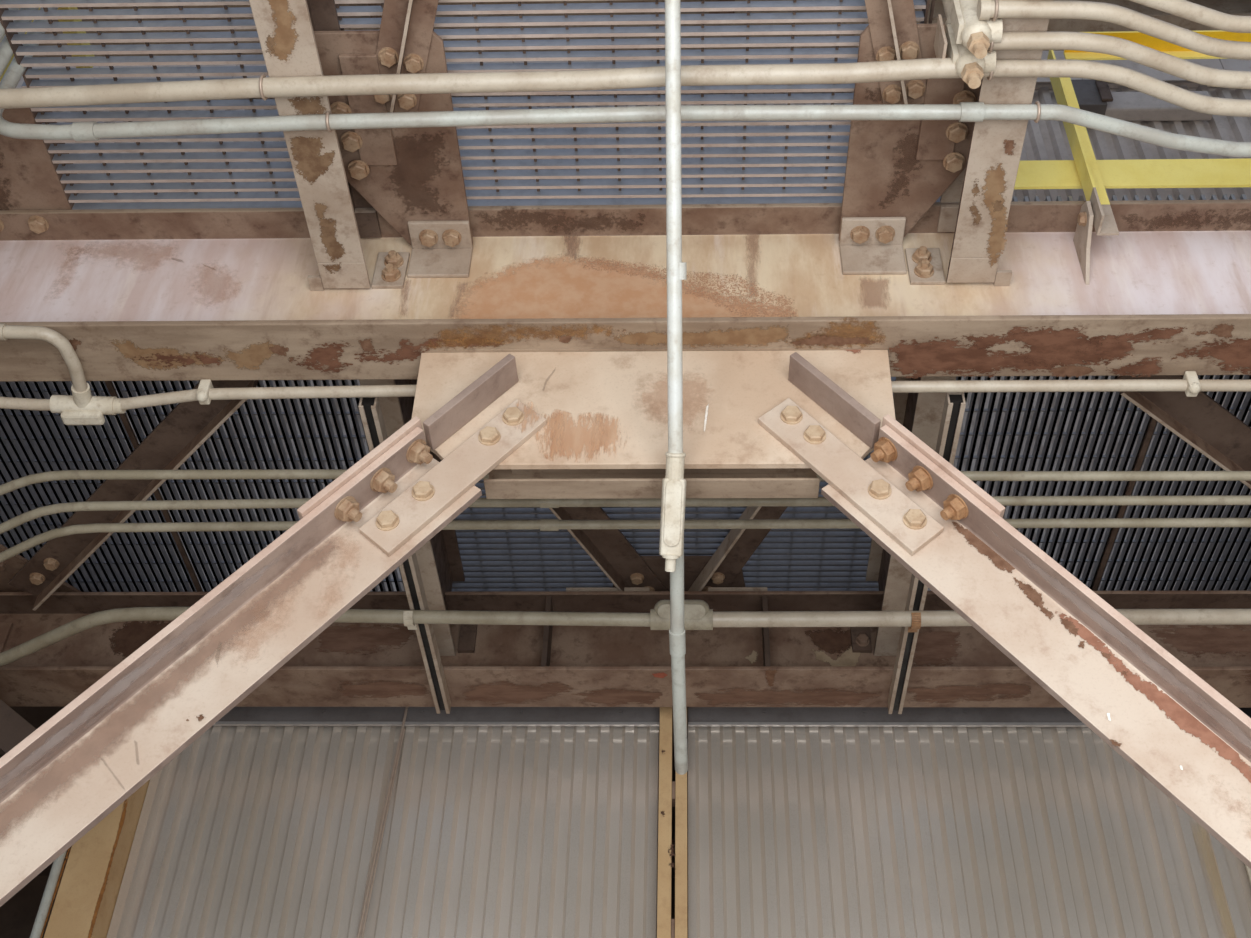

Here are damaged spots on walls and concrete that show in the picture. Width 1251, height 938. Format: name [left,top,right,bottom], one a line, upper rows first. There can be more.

corrosion [430,257,667,349]
corrosion [682,272,795,318]
peeling [952,522,1251,783]
peeling [694,688,882,707]
peeling [907,683,1031,703]